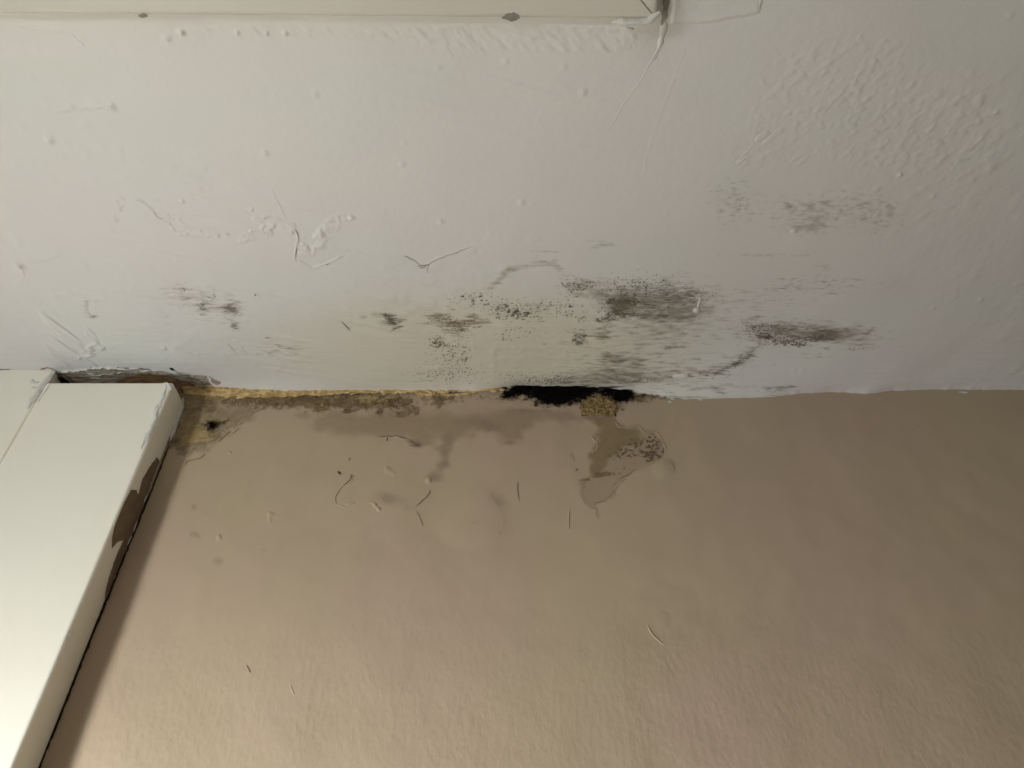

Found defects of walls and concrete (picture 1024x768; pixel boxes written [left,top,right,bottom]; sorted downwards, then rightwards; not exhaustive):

crack [605,21,668,135]
crack [406,244,473,272]
leakage [415,274,721,387]
leakage [497,355,678,407]
mould [690,316,869,379]
spalling [575,394,666,481]
peeling [105,457,159,600]